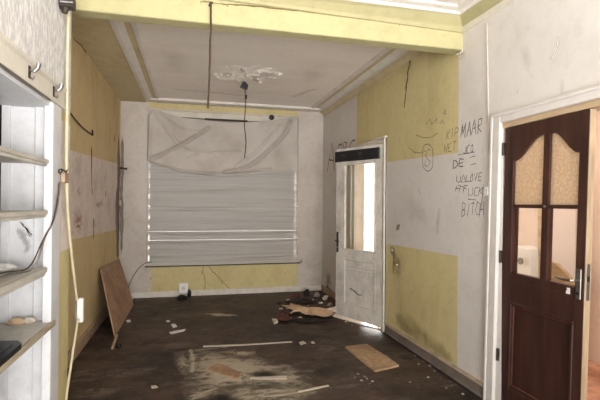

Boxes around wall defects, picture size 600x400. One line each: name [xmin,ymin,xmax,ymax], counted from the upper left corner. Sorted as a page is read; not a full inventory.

flaking render [211,64,284,84]